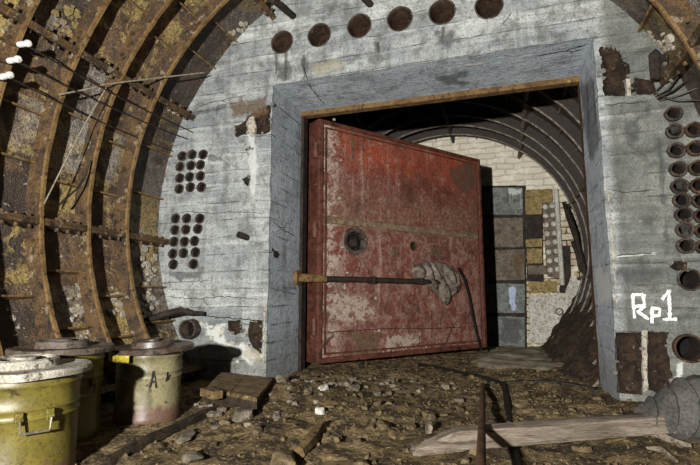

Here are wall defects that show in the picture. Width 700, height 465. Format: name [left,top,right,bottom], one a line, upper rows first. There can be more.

spalling [599,43,657,97]
spalling [234,102,275,137]
flaking render [199,300,266,372]
spalling [612,329,673,395]